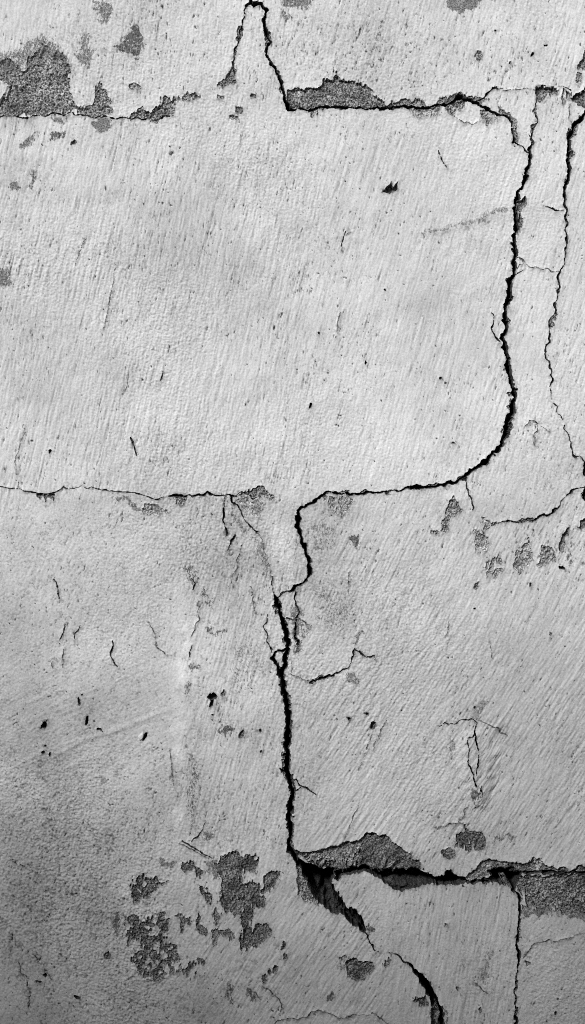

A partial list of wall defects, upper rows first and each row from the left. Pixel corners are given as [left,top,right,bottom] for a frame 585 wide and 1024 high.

peeling [0,40,113,119]
crack [0,112,174,121]
peeling [127,91,201,124]
peeling [286,69,519,143]
crack [168,0,585,863]
crack [0,482,164,501]
peeling [300,832,424,871]
peeling [441,828,585,916]
peeling [124,849,281,982]
crack [365,932,409,964]
crack [469,868,585,1024]
crack [262,986,388,1024]